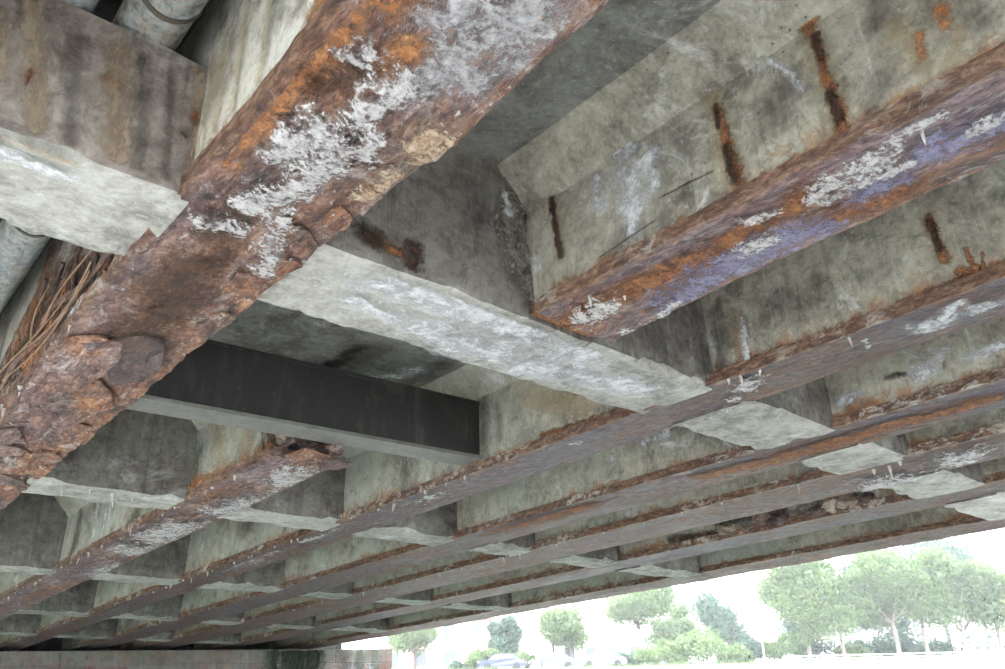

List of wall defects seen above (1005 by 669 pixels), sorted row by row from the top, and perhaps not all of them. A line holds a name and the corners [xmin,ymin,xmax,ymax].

leakage [0,0,50,134]
spalling [0,241,115,395]
rust [208,225,318,328]
leakage [185,0,591,278]
rust [323,120,468,273]
leakage [592,140,660,236]
rust [554,182,828,329]
rust [712,103,746,189]
leakage [765,58,803,91]
rust [797,15,851,138]
rust [0,335,165,501]
leakage [264,650,326,669]